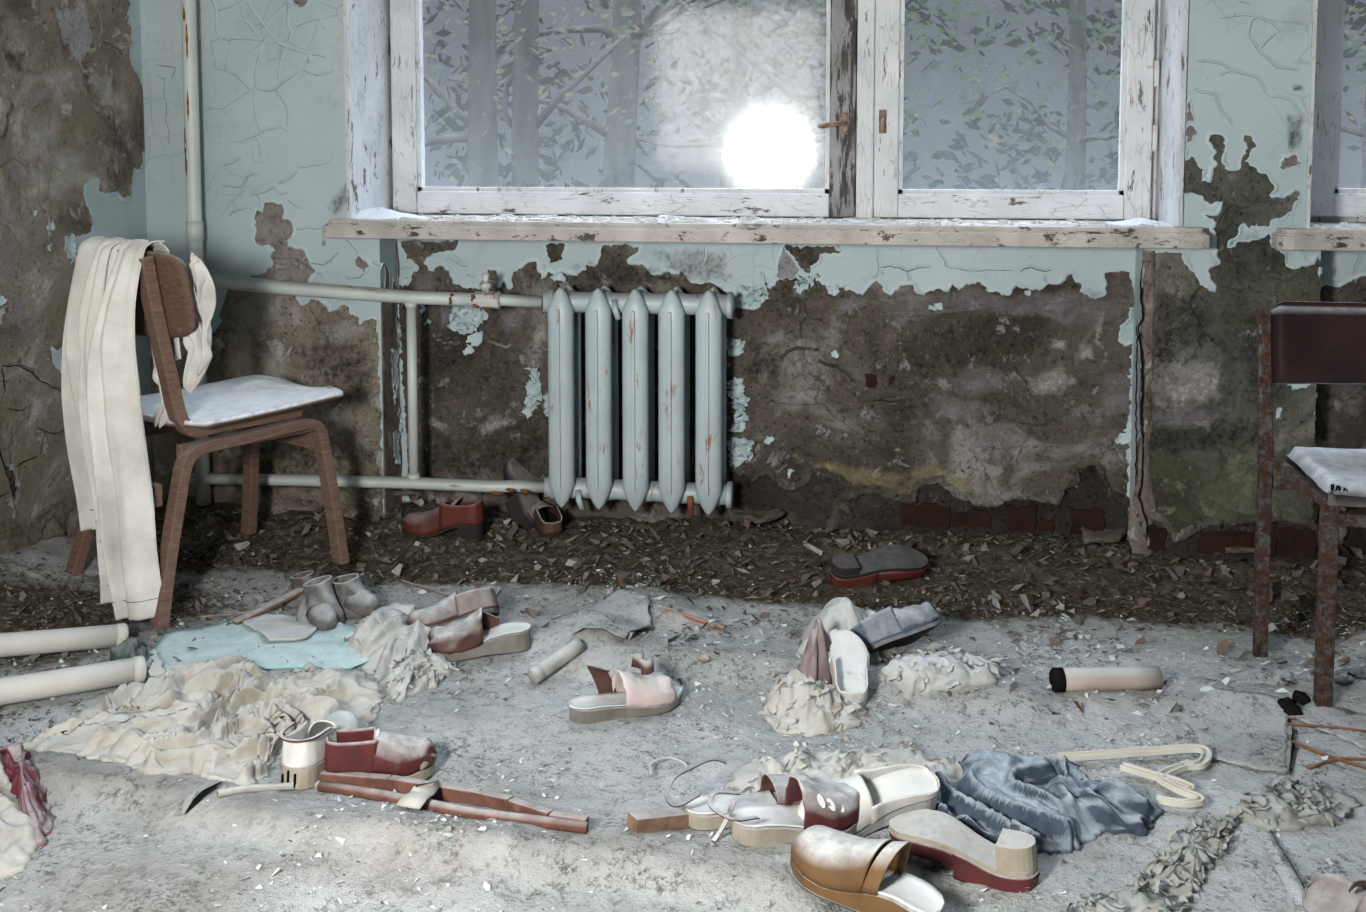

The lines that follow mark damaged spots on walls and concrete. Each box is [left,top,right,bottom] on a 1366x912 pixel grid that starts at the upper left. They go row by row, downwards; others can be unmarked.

crack [0,346,64,509]
peeling [0,0,145,555]
peeling [146,97,1366,566]
crack [1194,0,1307,125]